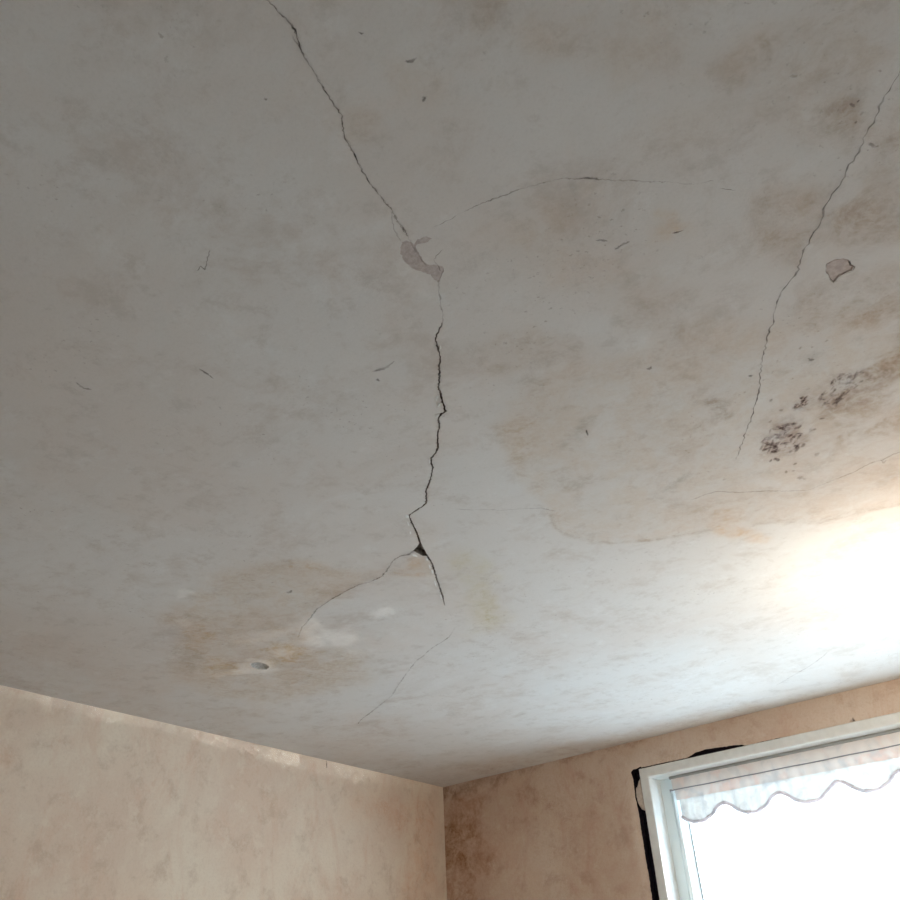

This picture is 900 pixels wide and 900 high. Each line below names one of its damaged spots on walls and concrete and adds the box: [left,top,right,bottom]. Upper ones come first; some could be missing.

spalling [400,236,444,282]
spalling [826,258,855,282]
crack [383,323,447,605]